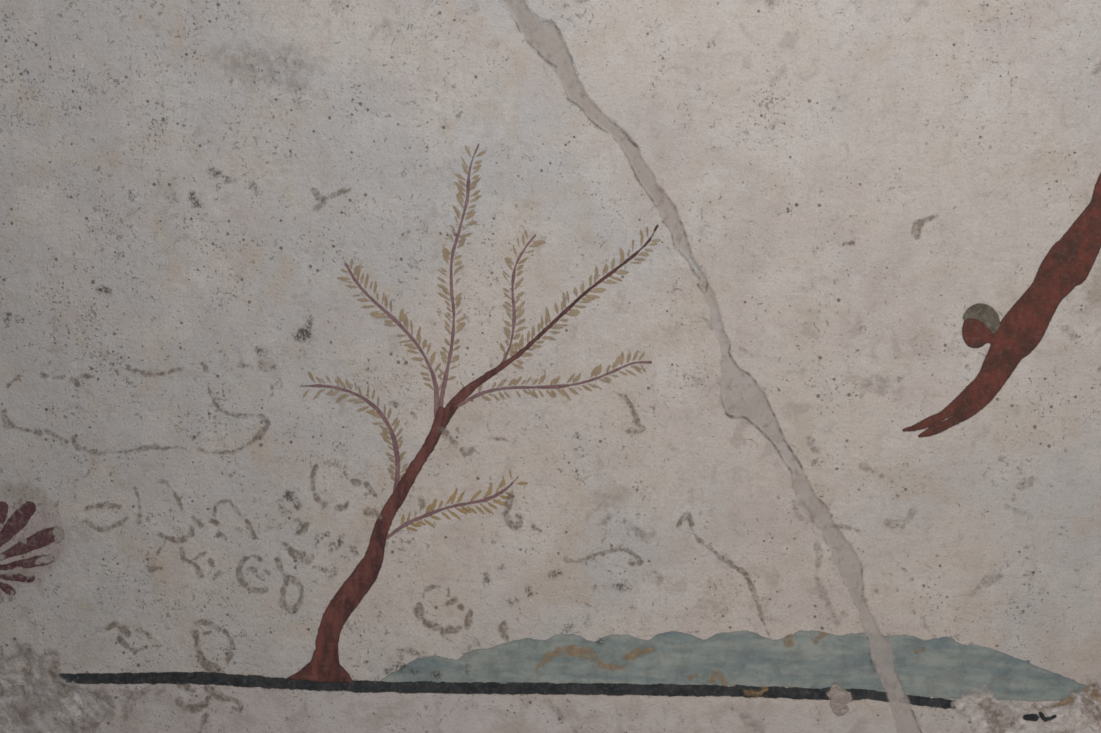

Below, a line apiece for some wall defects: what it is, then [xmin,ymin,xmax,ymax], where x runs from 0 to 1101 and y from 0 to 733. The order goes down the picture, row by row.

crack [502,0,920,733]
flaking render [951,684,1101,733]